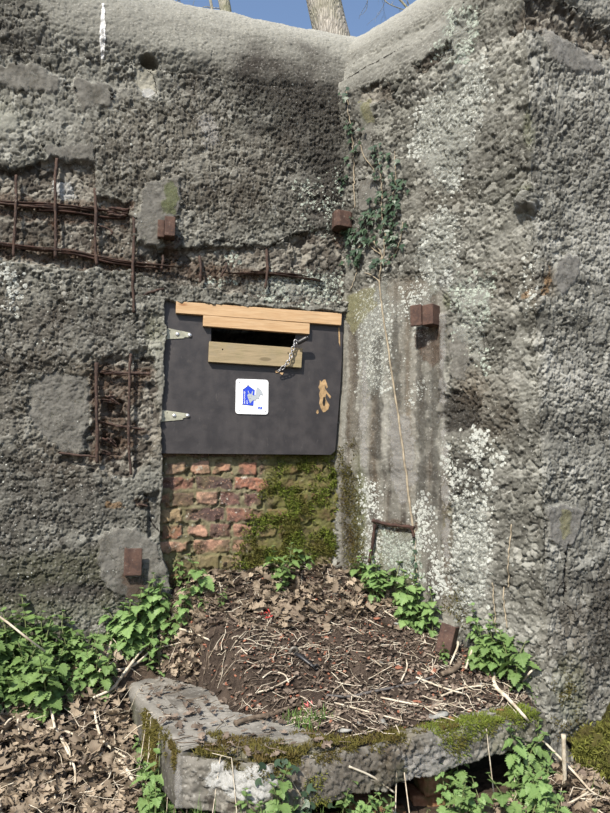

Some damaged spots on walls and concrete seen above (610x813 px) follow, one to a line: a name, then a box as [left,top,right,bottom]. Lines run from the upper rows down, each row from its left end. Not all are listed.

spalling [135,68,158,98]
spalling [0,142,346,313]
spalling [23,353,160,478]